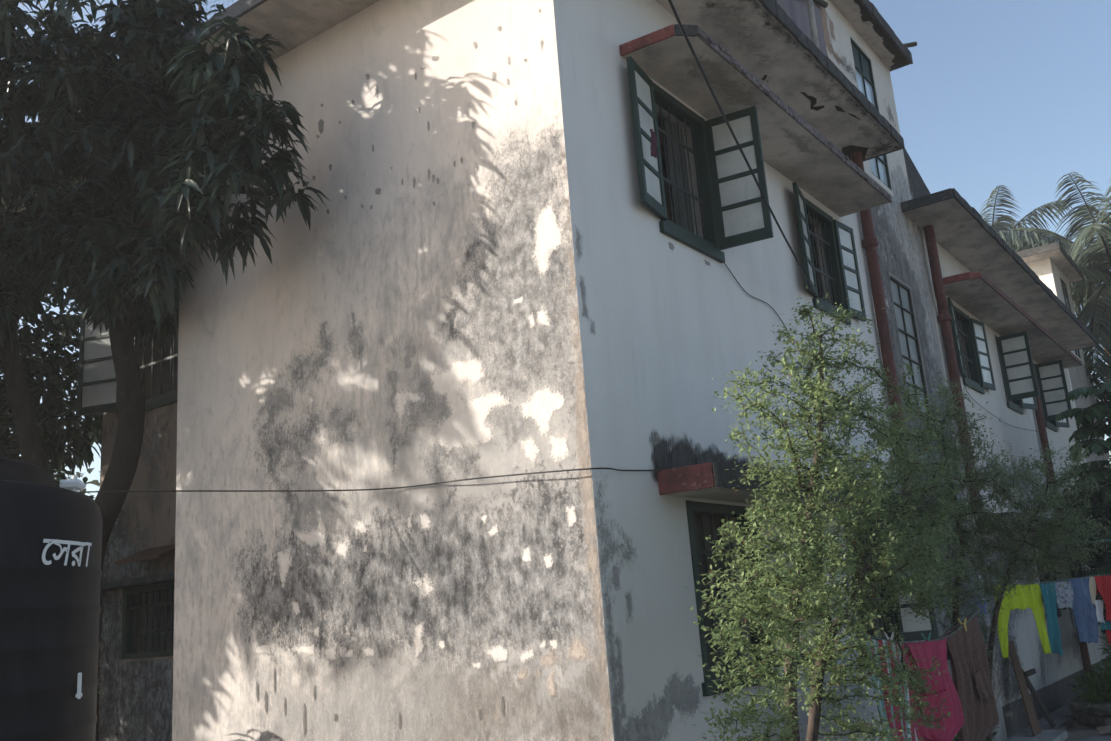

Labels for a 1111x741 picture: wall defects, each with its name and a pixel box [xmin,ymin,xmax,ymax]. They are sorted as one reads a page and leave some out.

damp [700,0,900,155]
crack [800,92,861,120]
damp [435,130,595,422]
peeling [532,199,576,288]
damp [652,432,778,483]
damp [871,188,1036,709]
peeling [276,521,369,590]
peeling [407,512,430,532]
damp [232,322,700,741]
peeling [430,307,612,741]
peeling [294,627,374,661]
peeling [414,622,425,657]